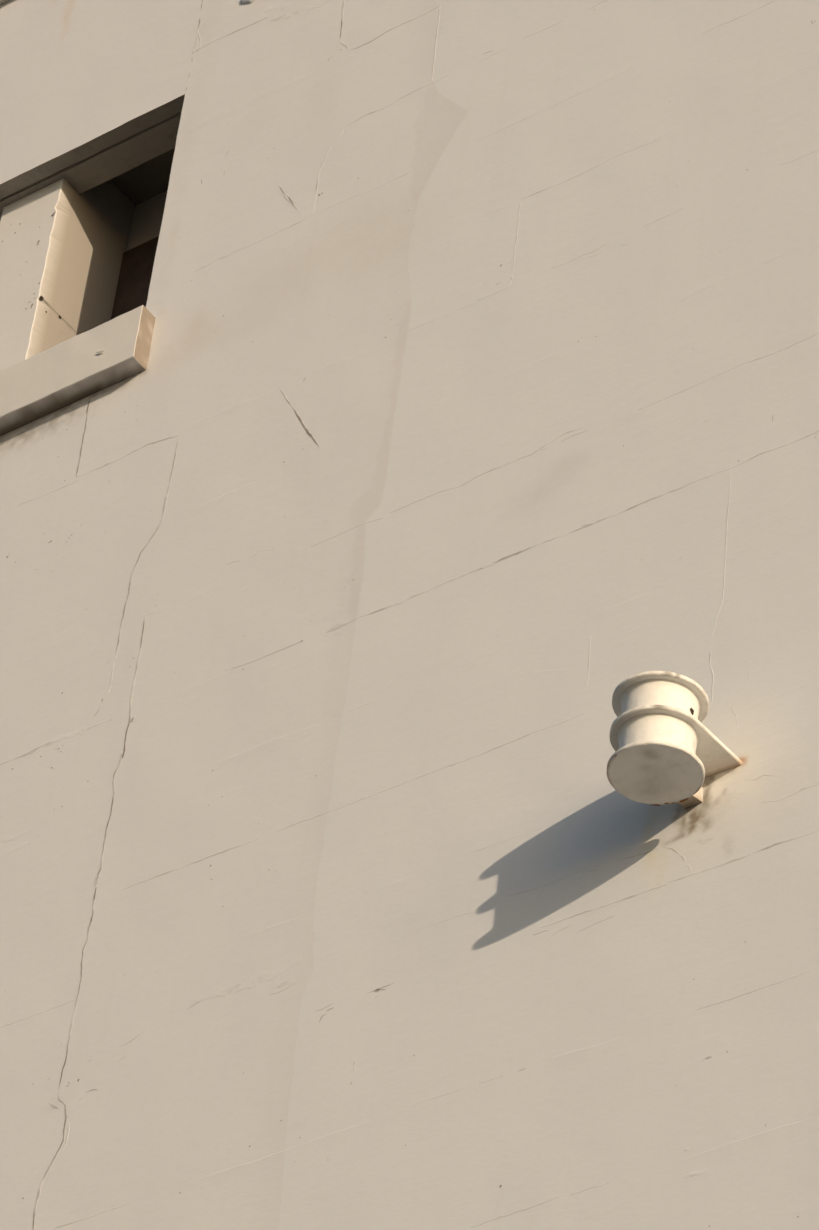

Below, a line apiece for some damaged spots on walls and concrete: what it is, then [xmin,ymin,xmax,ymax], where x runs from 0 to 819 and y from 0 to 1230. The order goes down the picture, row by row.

crack [230,430,819,704]
crack [0,396,587,1230]
crack [508,830,819,937]